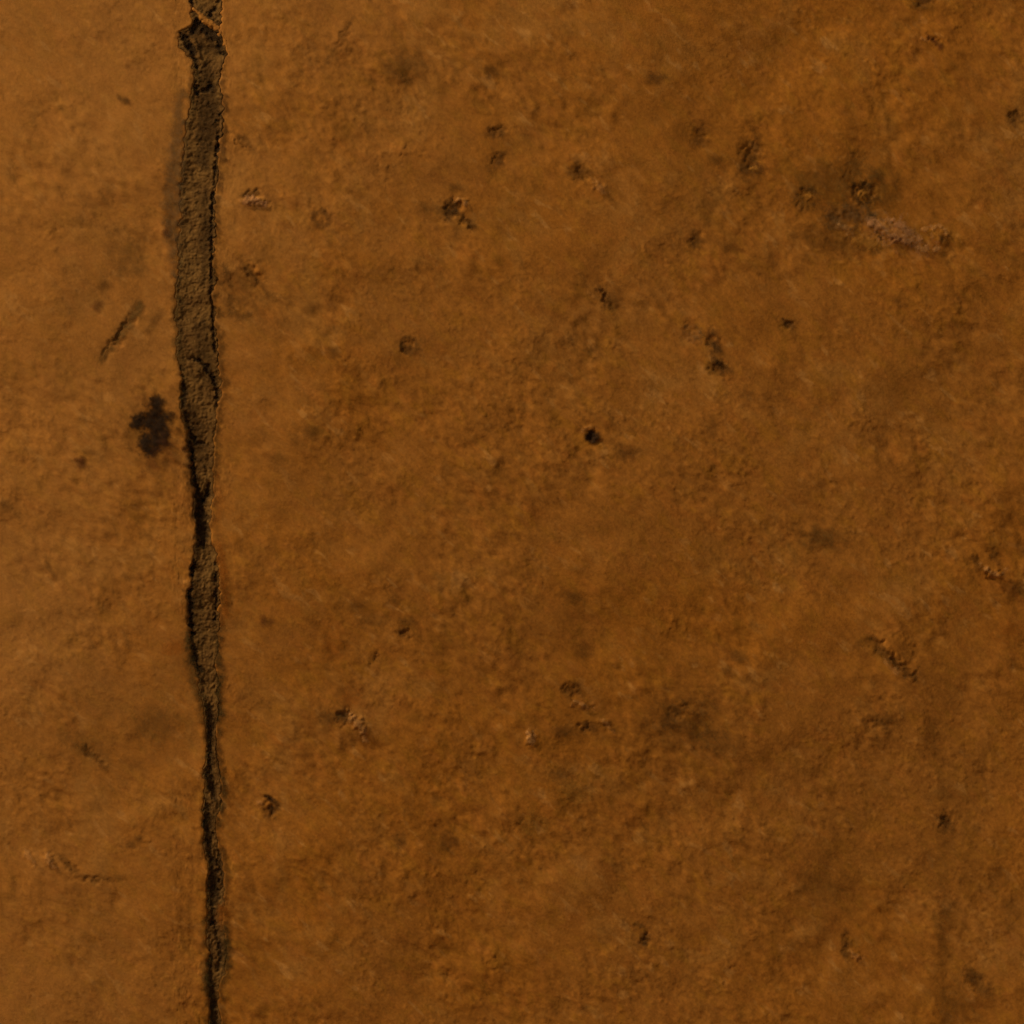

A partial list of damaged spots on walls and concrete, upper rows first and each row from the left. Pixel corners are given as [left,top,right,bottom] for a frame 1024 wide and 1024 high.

damp [129,396,172,456]
crack [174,0,230,1024]